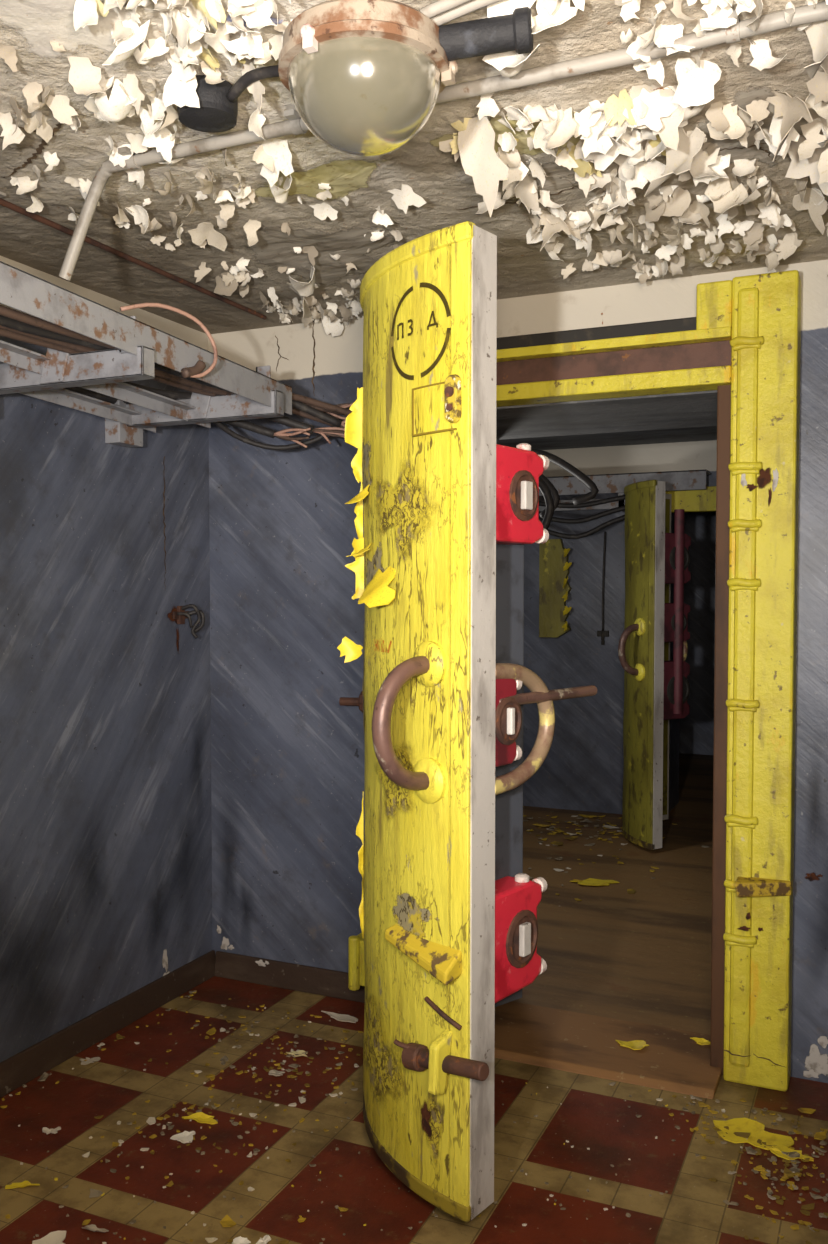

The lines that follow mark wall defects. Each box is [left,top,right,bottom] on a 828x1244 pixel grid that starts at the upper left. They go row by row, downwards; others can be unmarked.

peeling [0,0,427,337]
peeling [430,0,828,284]
spalling [803,1036,828,1078]